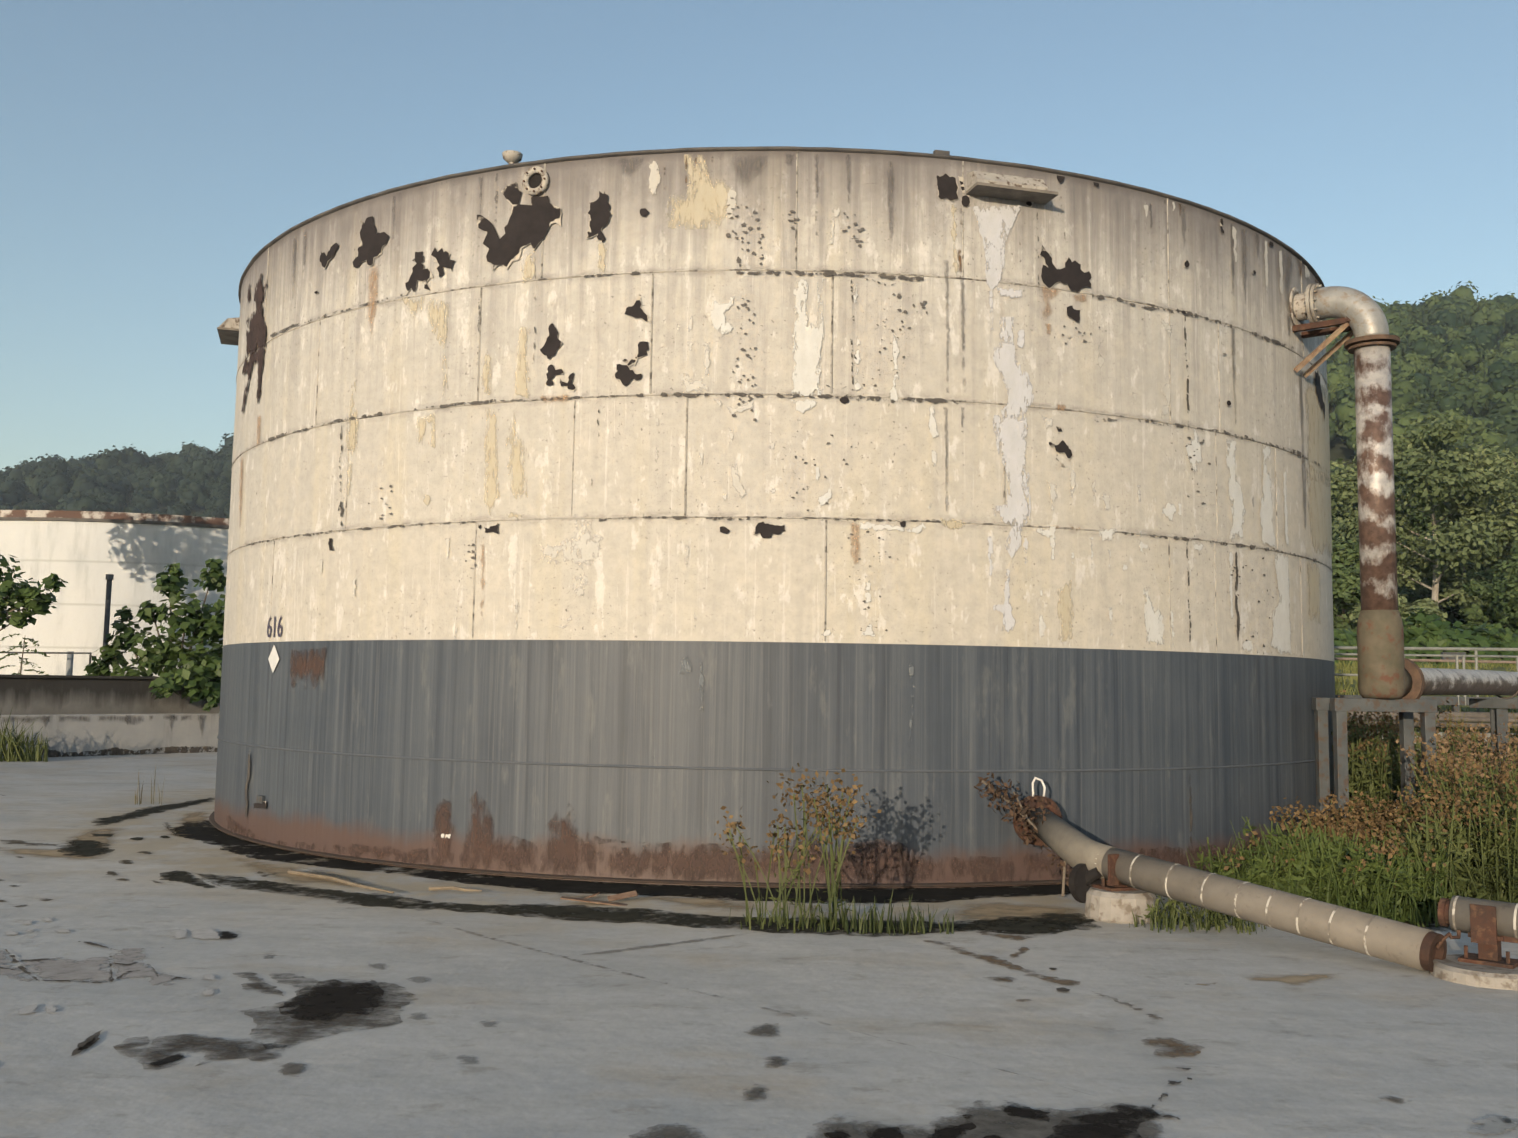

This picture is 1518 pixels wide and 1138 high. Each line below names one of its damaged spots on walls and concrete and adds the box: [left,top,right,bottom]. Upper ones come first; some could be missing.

peeling [353,216,389,268]
peeling [477,182,562,270]
peeling [405,247,455,295]
peeling [625,296,651,323]
peeling [1040,245,1100,344]
peeling [241,274,267,411]
peeling [540,323,576,391]
peeling [615,341,649,386]
corrosion [172,813,207,837]
corrosion [249,862,349,885]
leakage [2,798,1098,937]
corrosion [1139,844,1264,870]